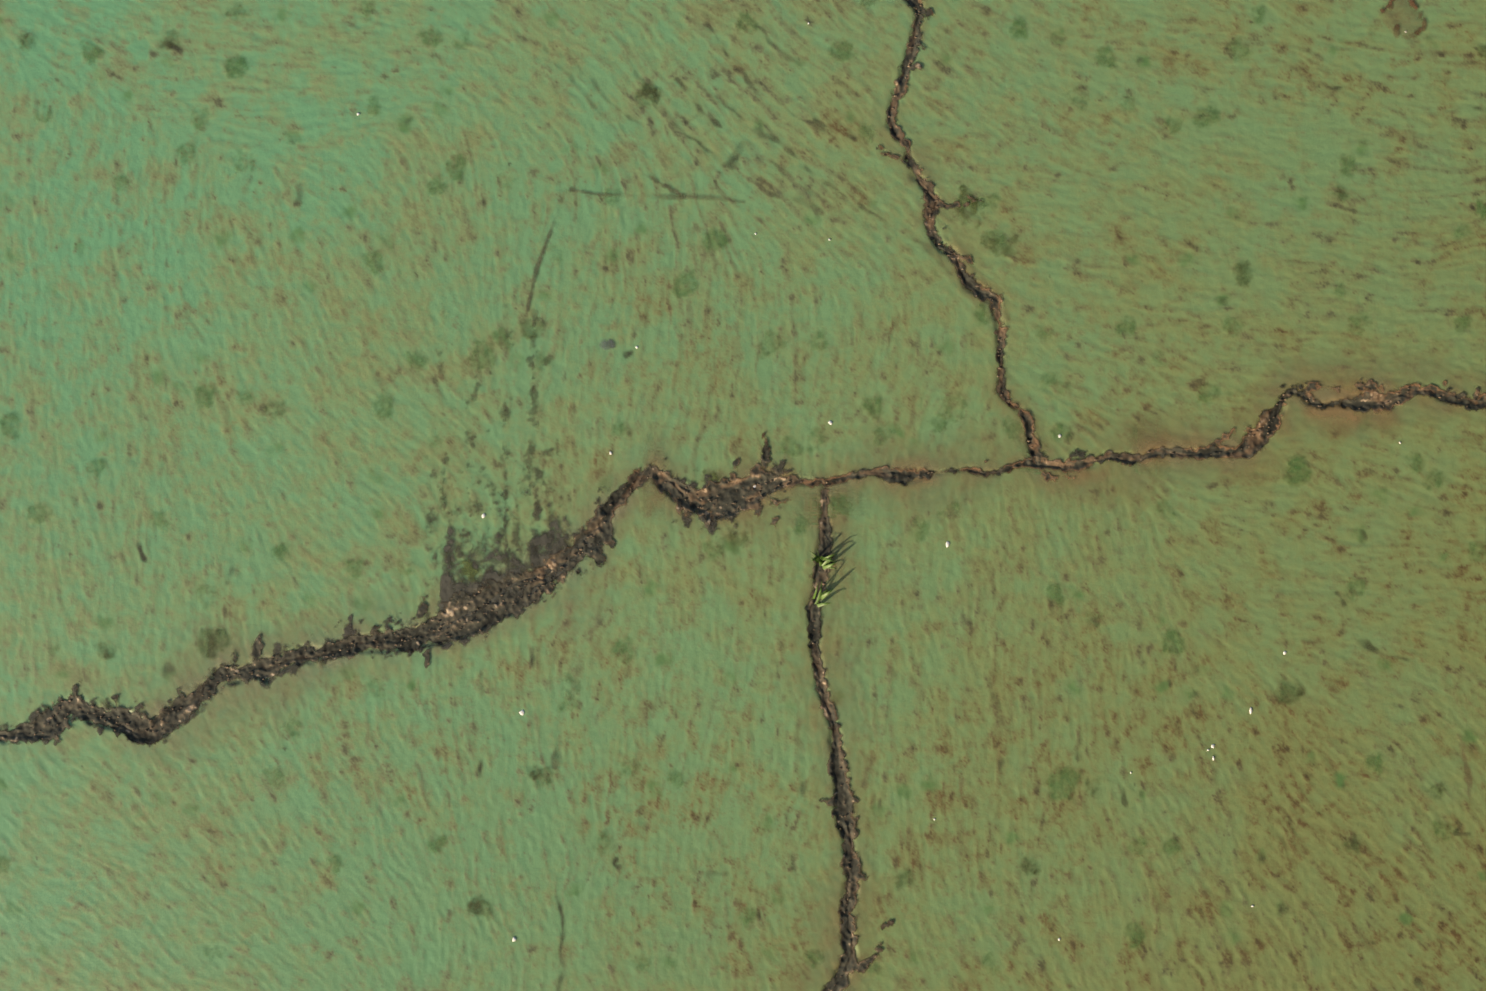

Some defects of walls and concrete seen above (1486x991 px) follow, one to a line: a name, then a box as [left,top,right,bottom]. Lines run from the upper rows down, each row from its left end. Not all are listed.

crack [526,234,550,311]
crack [876,0,1486,482]
crack [0,433,936,991]